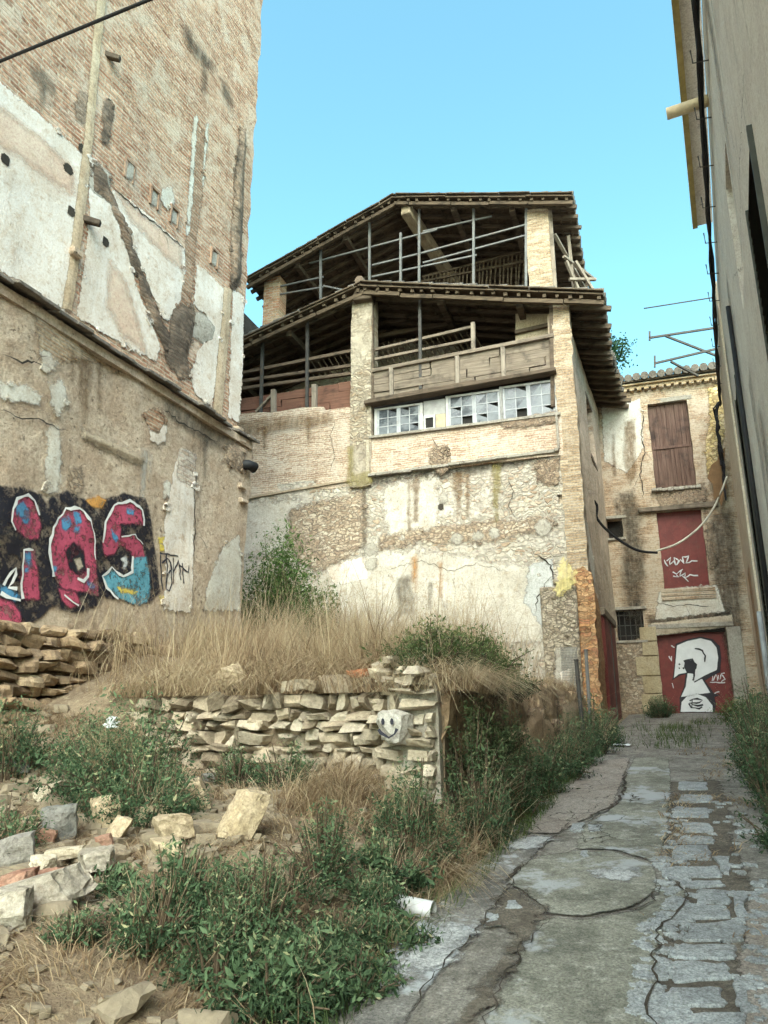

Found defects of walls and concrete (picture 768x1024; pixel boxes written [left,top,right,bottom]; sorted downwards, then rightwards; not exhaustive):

peeling [0,81,248,496]
crack [5,410,68,431]
spalling [534,457,560,486]
peeling [601,398,644,473]
crack [635,416,646,497]
peeling [160,448,301,613]
peeling [286,444,554,647]
crack [531,545,558,611]
water stain [616,495,642,616]